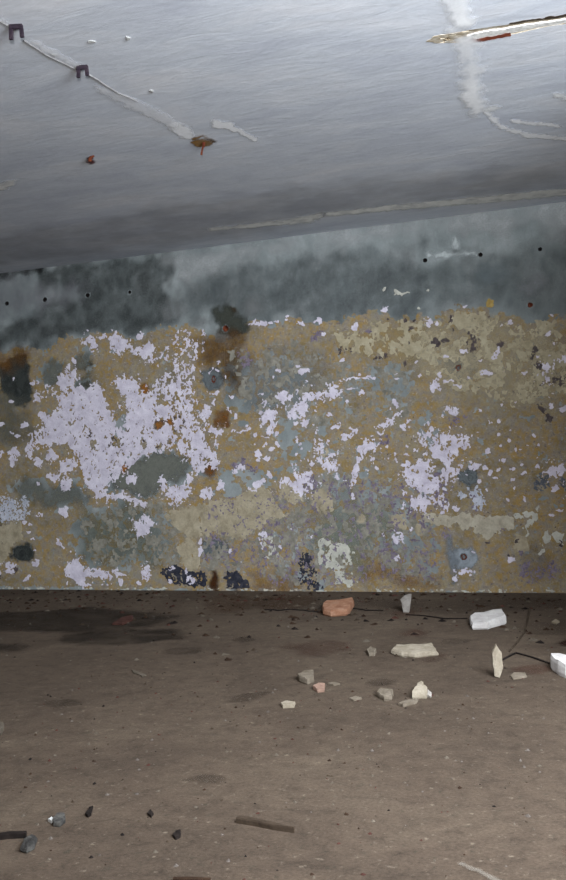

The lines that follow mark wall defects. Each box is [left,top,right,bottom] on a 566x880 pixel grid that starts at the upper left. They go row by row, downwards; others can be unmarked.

crack [426,14,566,43]
crack [0,21,137,101]
rust [191,136,215,147]
damp [0,260,181,349]
damp [200,302,258,336]
peeling [0,298,566,593]
flaking render [510,672,527,680]
flaking render [399,690,432,707]